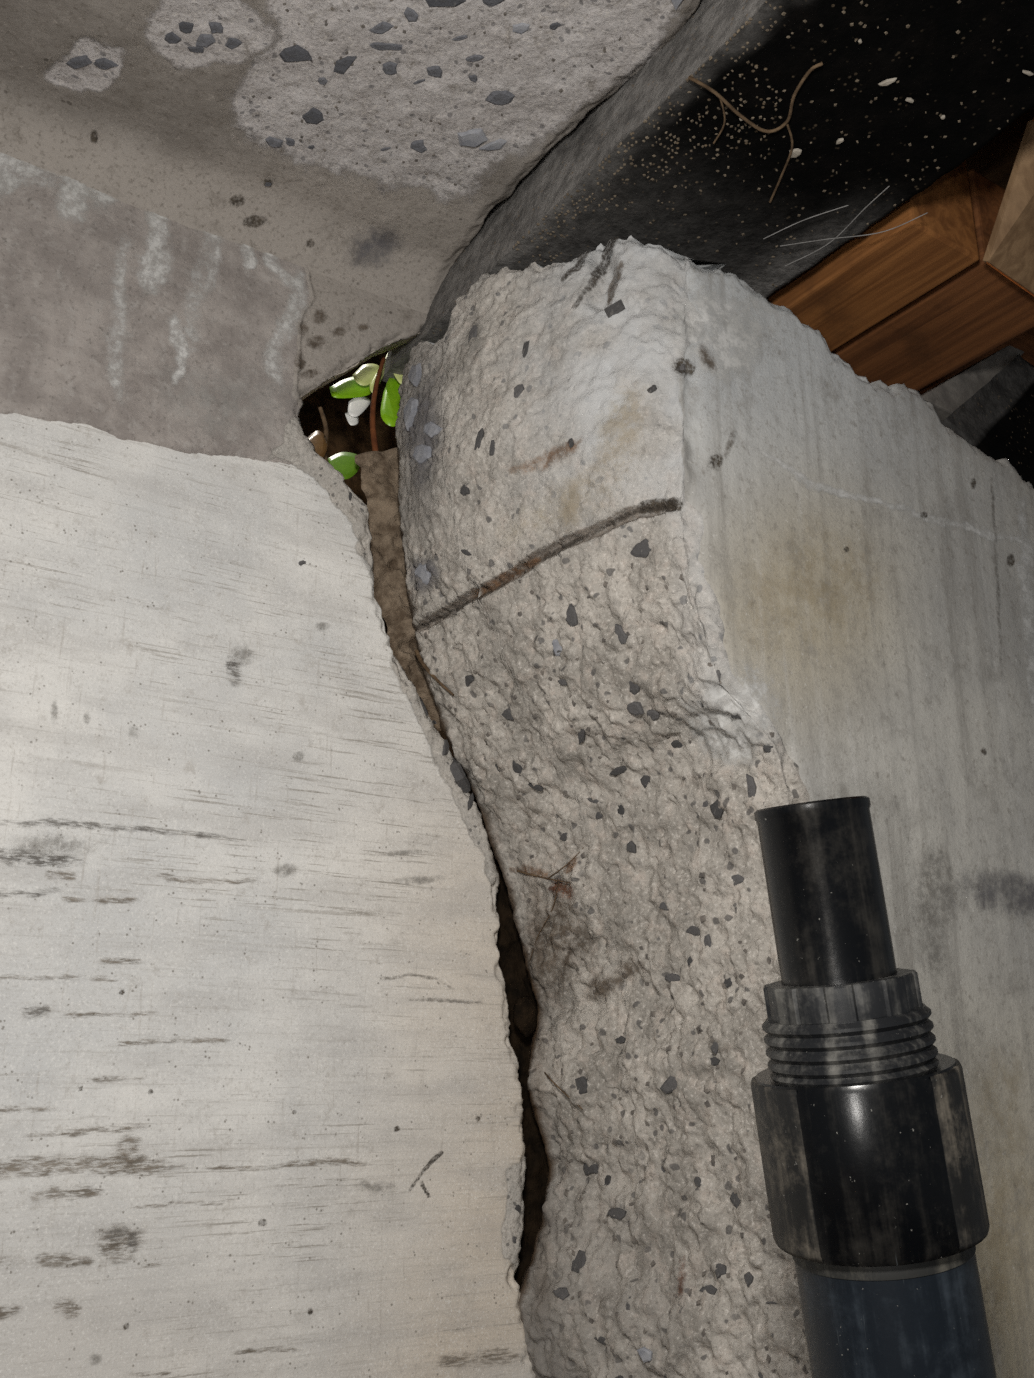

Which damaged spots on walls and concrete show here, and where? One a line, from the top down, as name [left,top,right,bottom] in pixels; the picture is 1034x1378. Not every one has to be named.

damp [672,291,774,384]
crack [355,448,682,731]
damp [686,667,776,764]
damp [756,449,1034,710]
crack [460,764,549,1291]
crack [410,1151,443,1197]